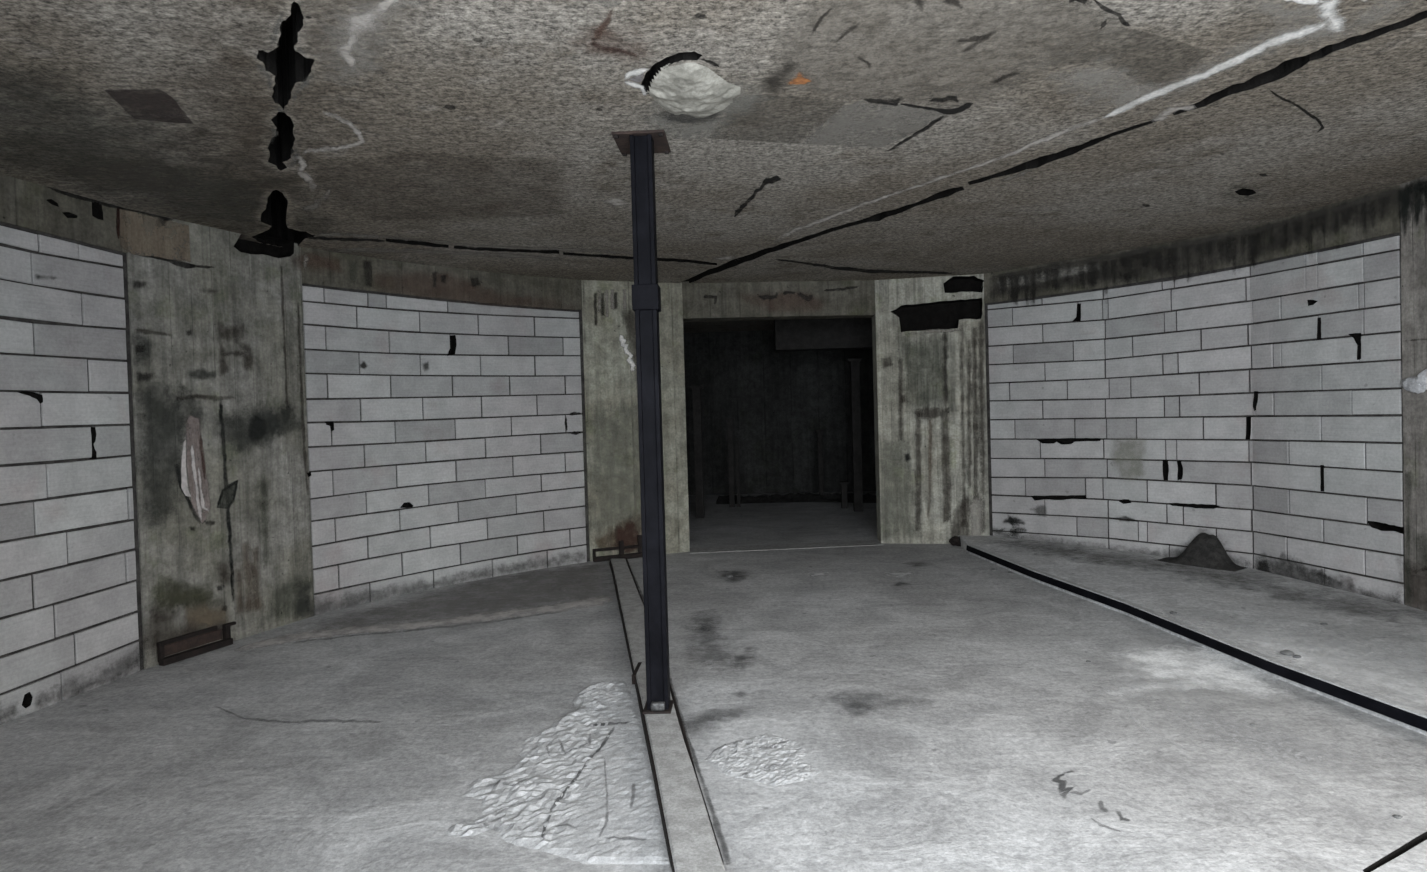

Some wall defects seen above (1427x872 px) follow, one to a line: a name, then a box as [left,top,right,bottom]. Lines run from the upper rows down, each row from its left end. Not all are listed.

crack [308,10,1427,283]
leakage [782,0,1343,238]
crack [1069,0,1130,28]
peeling [176,416,238,524]